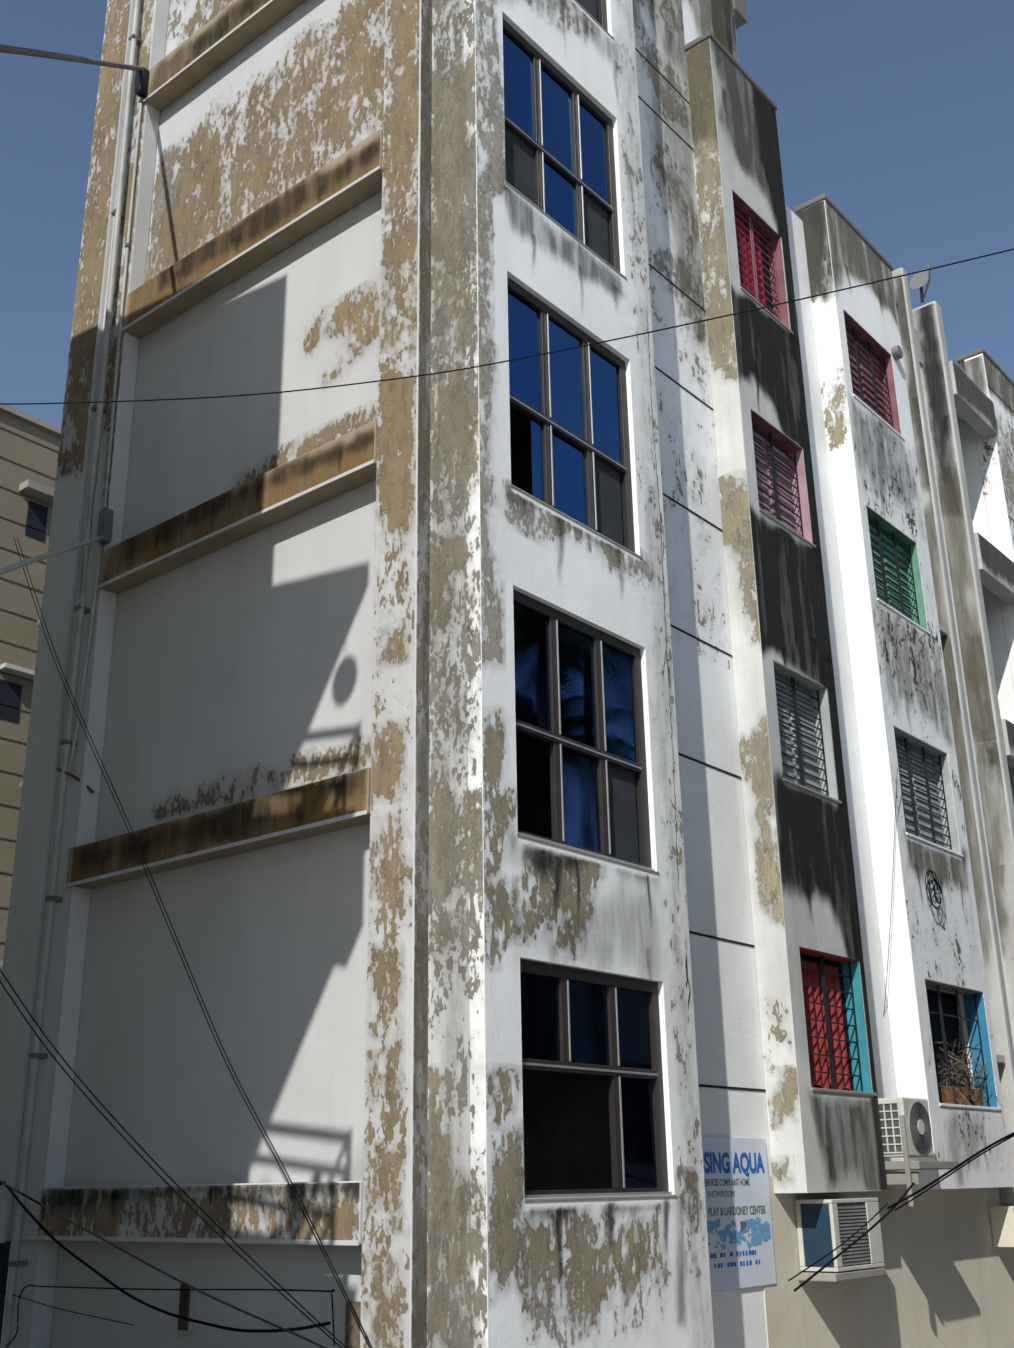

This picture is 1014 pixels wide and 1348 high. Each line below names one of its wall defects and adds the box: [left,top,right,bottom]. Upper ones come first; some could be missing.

peeling [38,0,760,1348]
water stain [632,0,1014,1190]
water stain [525,847,580,906]
peeling [739,715,784,926]
water stain [532,1208,571,1268]